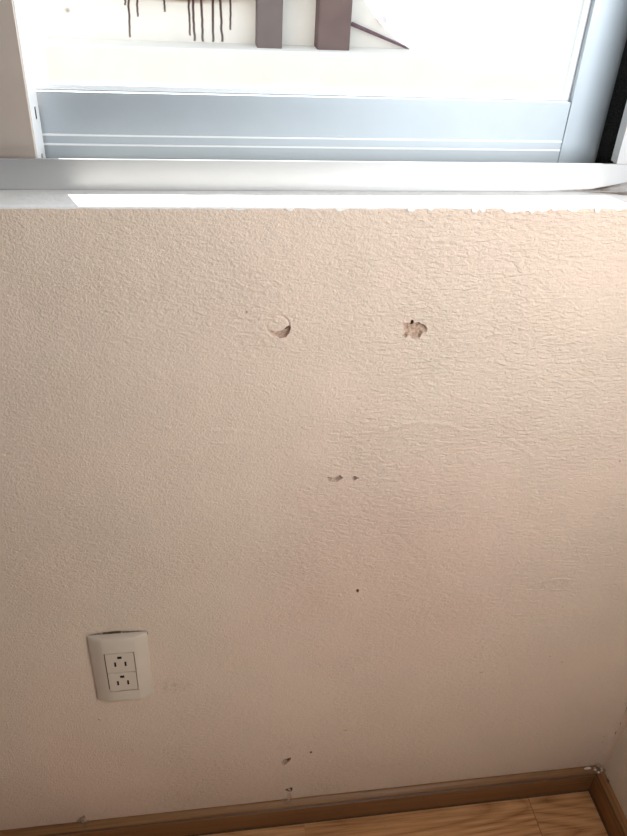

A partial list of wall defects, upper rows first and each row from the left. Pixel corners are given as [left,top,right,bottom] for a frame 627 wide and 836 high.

spalling [265,314,291,339]
spalling [402,319,428,339]